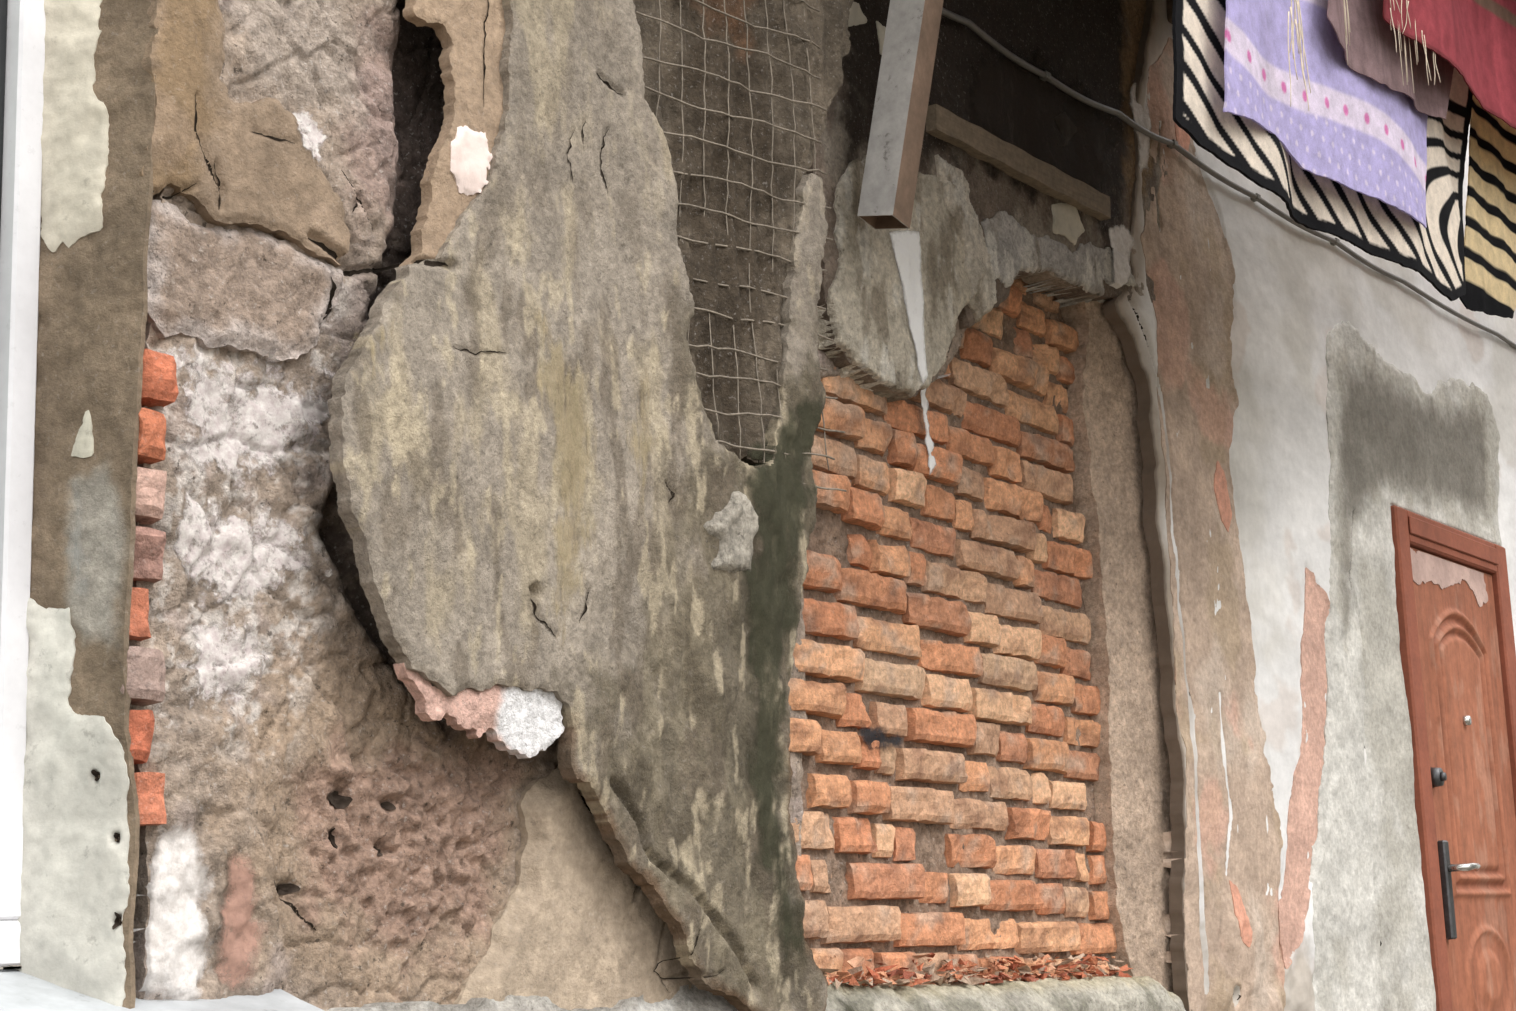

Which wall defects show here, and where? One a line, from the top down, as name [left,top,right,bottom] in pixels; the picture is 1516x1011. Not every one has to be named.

flaking render [15,0,559,1011]
spalling [633,0,886,465]
spalling [788,278,1133,990]
peeling [1140,37,1330,1011]